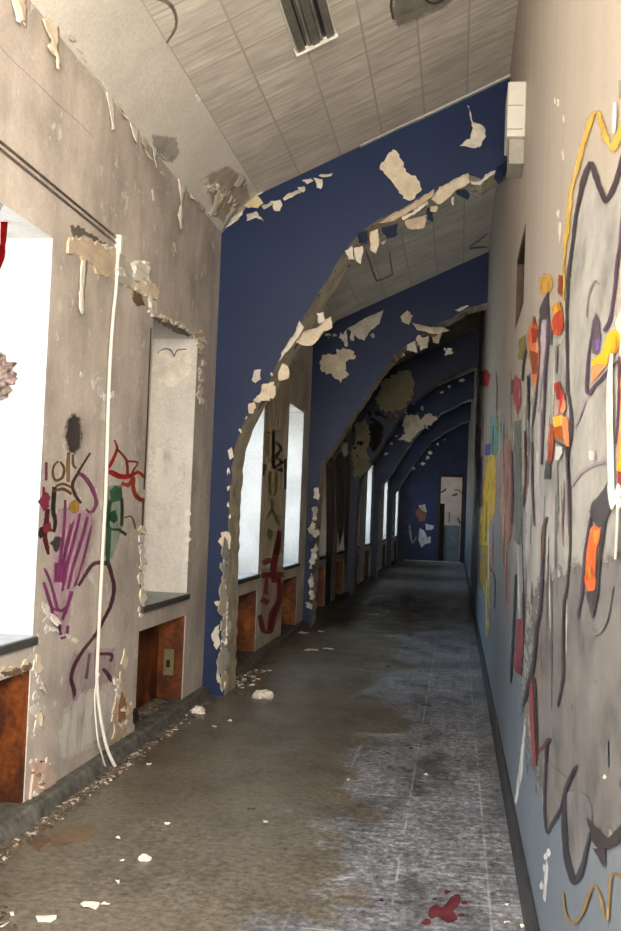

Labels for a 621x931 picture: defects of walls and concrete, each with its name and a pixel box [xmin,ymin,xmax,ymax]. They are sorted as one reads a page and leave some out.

peeling [12,0,28,28]
peeling [460,106,486,148]
peeling [345,149,507,264]
flaking render [66,225,207,404]
peeling [245,311,383,419]
flaking render [351,310,454,479]
peeling [137,525,148,618]
peeling [183,490,191,578]
flaking render [211,531,232,691]
flaking render [59,648,139,759]
flaking render [29,757,57,799]